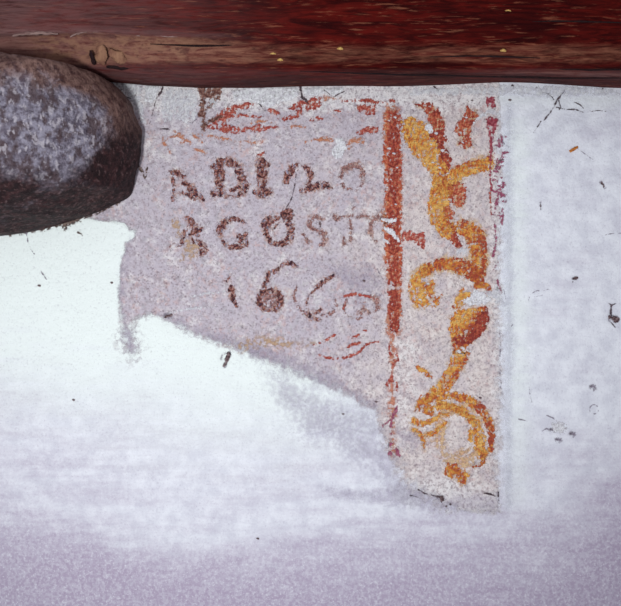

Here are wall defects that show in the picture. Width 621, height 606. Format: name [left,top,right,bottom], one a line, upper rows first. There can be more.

crack [536,87,606,127]